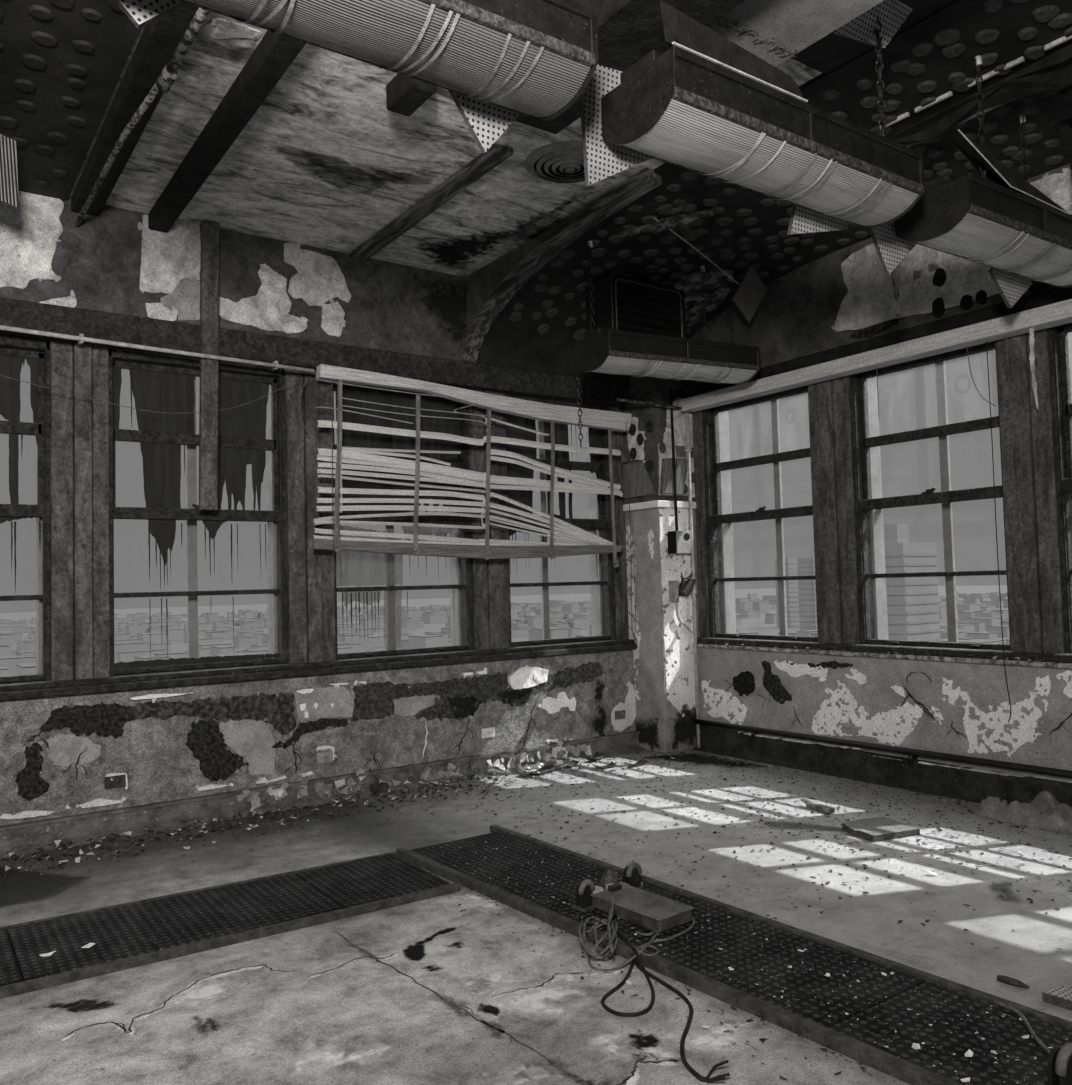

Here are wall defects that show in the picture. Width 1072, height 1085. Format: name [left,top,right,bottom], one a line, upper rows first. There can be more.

leakage [278,147,430,193]
peeling [0,191,64,289]
peeling [39,290,77,308]
peeling [138,215,201,321]
peeling [219,241,351,337]
peeling [627,396,1072,760]
peeling [611,526,642,732]
flaking render [0,661,603,819]
peeling [918,761,1034,777]
crack [63,928,615,1085]
crack [616,1060,670,1085]